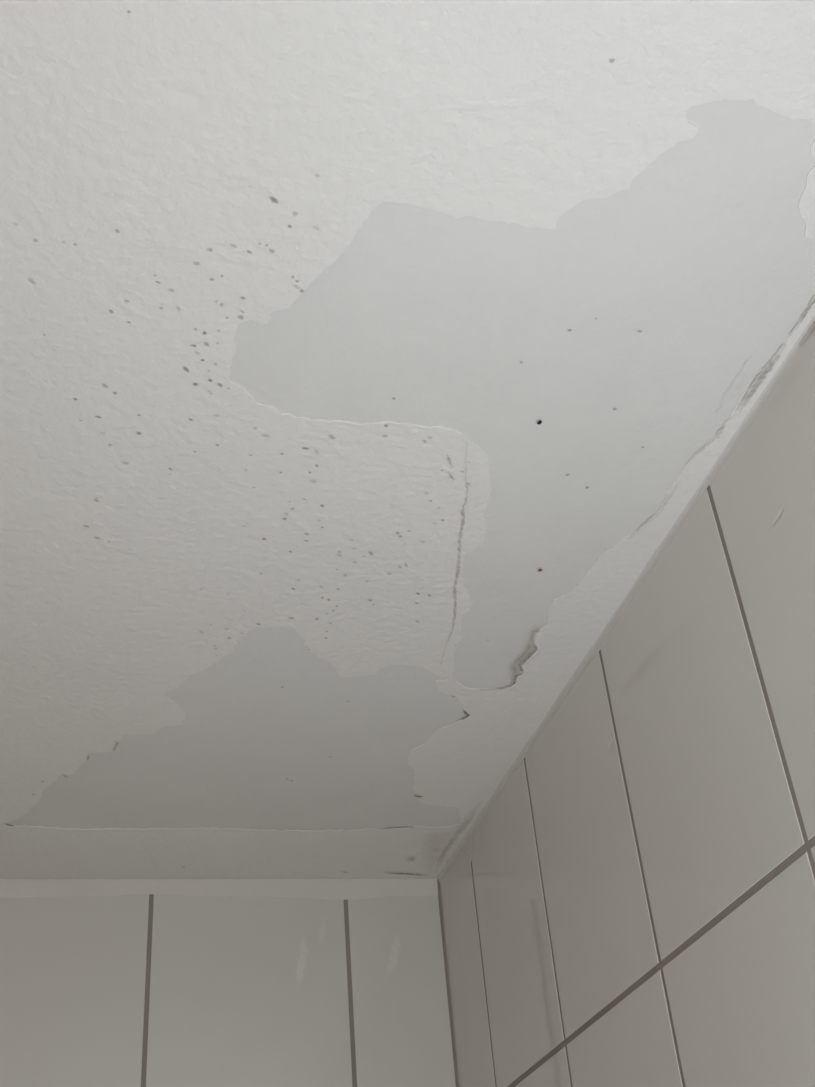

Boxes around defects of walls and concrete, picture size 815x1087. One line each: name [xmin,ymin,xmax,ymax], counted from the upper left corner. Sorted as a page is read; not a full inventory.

water stain [182,296,247,395]
crack [440,442,472,665]